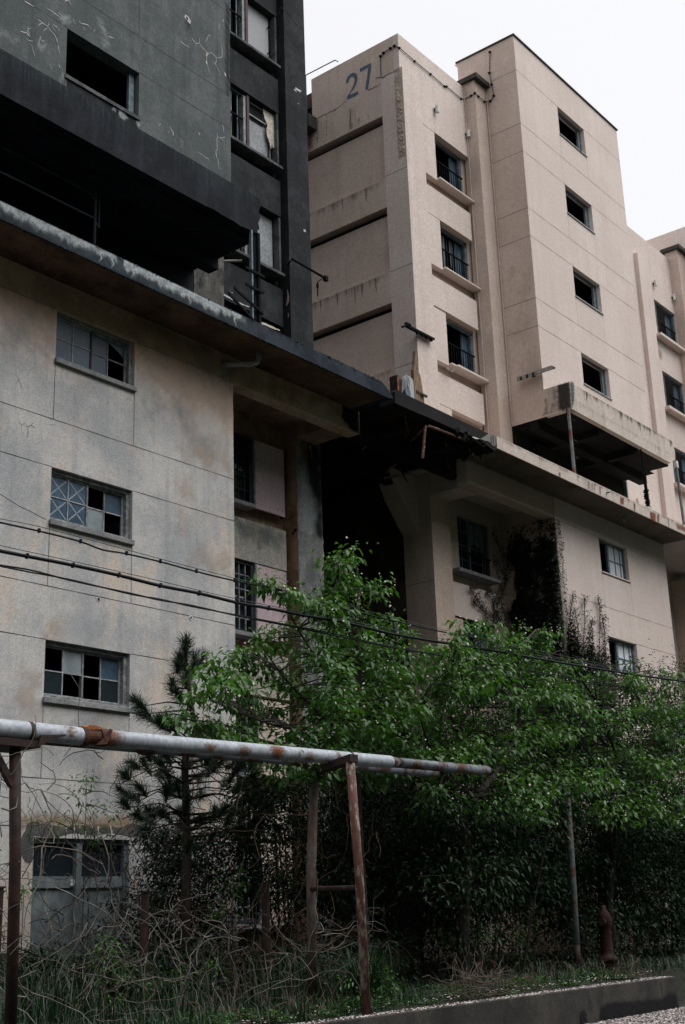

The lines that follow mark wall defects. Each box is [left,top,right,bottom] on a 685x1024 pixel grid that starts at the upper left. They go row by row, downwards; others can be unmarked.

crack [21,0,115,67]
damp [0,201,242,322]